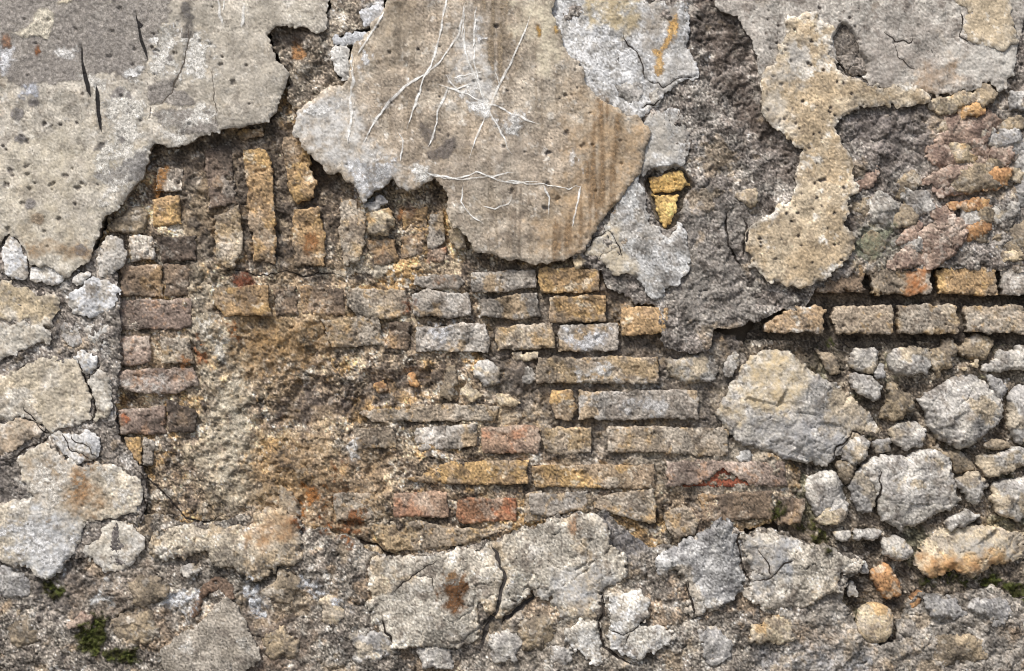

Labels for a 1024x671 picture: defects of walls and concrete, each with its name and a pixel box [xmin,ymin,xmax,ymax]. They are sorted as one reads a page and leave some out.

rust [653,14,678,76]
crack [482,545,534,644]
spalling [94,0,1024,556]
spalling [714,265,1024,644]